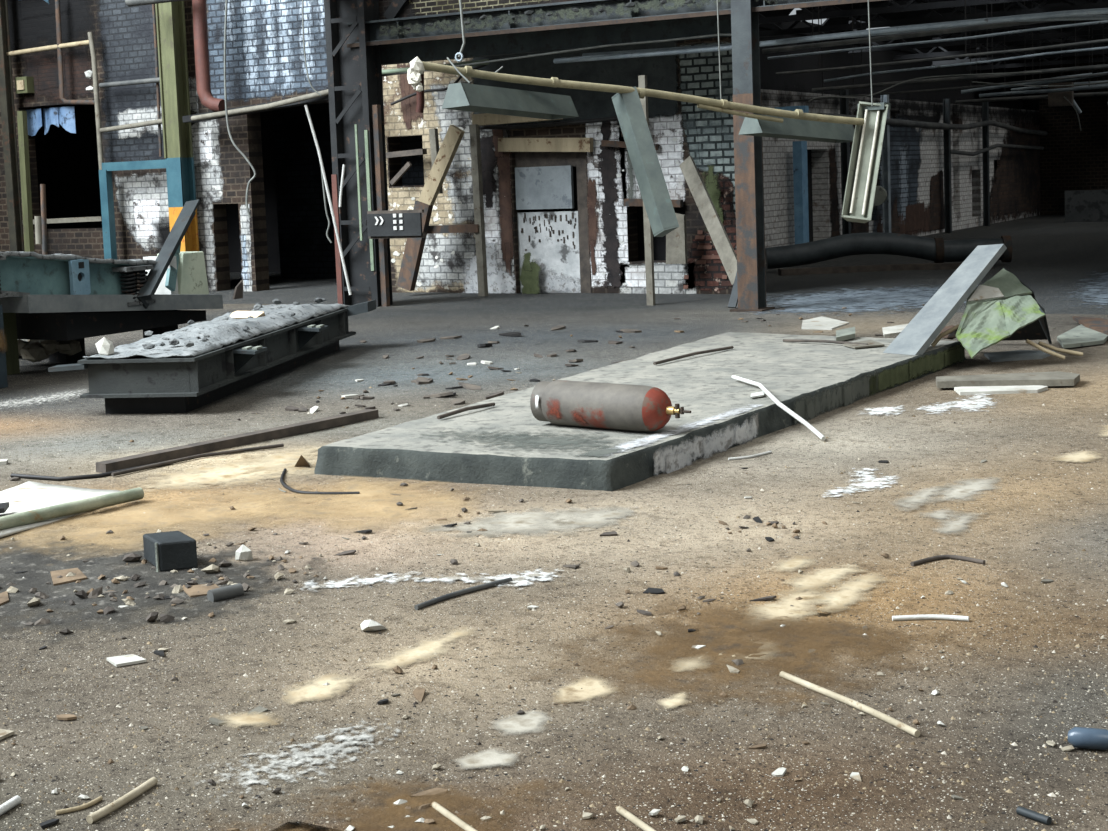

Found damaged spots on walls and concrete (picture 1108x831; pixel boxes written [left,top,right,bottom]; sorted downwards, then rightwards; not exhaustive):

spalling [379,0,731,36]
peeling [115,173,169,251]
peeling [191,119,223,291]
peeling [382,58,514,293]
peeling [585,120,733,294]
peeling [649,42,737,256]